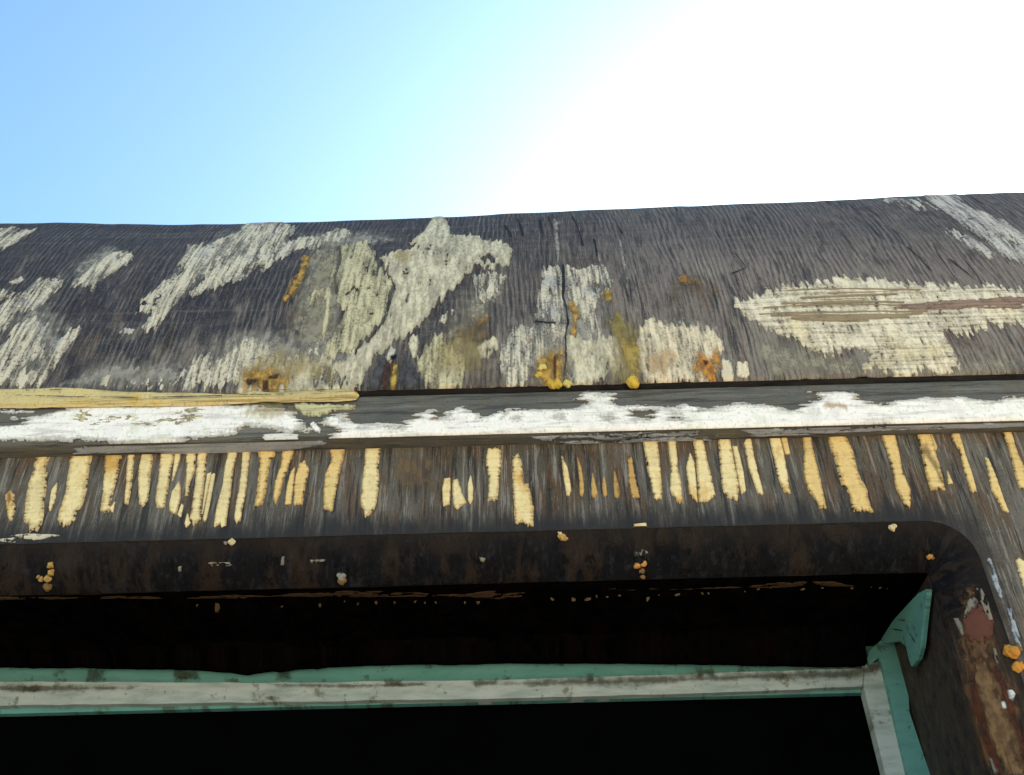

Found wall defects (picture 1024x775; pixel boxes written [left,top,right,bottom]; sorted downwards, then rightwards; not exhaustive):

peeling [883,194,1024,266]
corrosion [284,255,312,302]
crack [535,265,577,382]
corrosion [569,302,578,336]
corrosion [242,366,290,392]
peeling [0,216,1024,543]
corrosion [537,347,563,386]
corrosion [693,350,720,382]